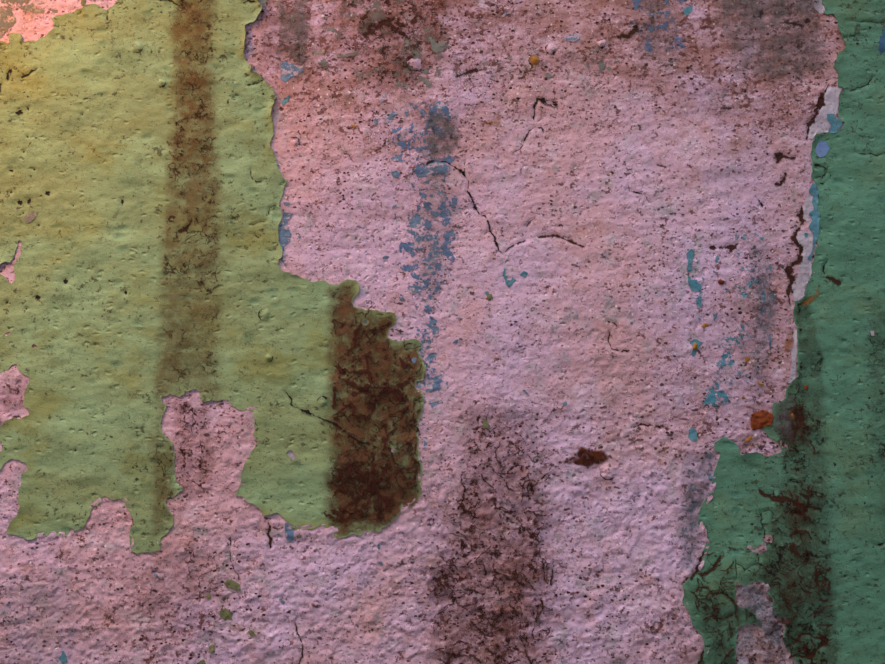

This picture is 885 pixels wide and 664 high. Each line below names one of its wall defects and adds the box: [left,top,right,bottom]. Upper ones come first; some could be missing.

peeling [0,0,117,44]
damp [342,0,449,85]
damp [163,0,218,312]
crack [513,97,558,153]
peeling [808,87,844,139]
crack [426,160,585,253]
peeling [791,183,820,301]
damp [156,401,212,493]
crack [286,392,370,445]
corrosion [561,447,608,466]
corrosion [745,410,774,442]
peeling [733,581,798,664]